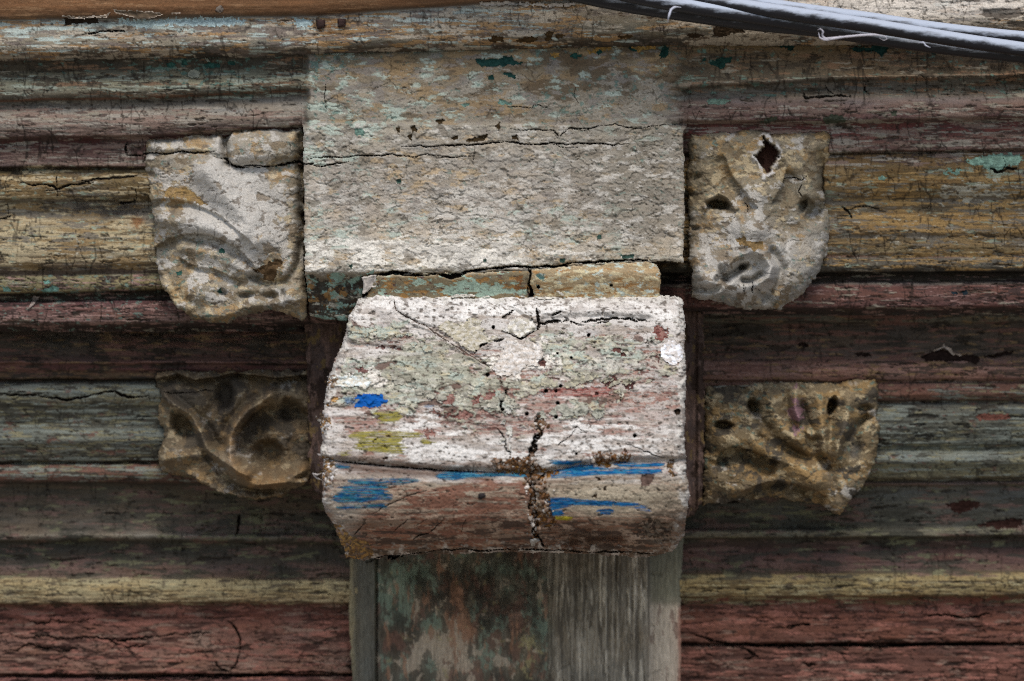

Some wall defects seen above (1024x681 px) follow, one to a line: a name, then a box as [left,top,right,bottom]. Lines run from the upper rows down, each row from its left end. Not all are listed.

peeling [488,31,669,59]
peeling [475,55,523,80]
crack [20,87,682,205]
peeling [451,122,501,142]
crack [811,265,1024,285]
crack [377,259,692,368]
peeling [334,365,372,389]
peeling [438,317,652,420]
peeling [652,325,684,365]
peeling [921,345,1014,364]
peeling [390,373,515,449]
crack [329,389,653,563]